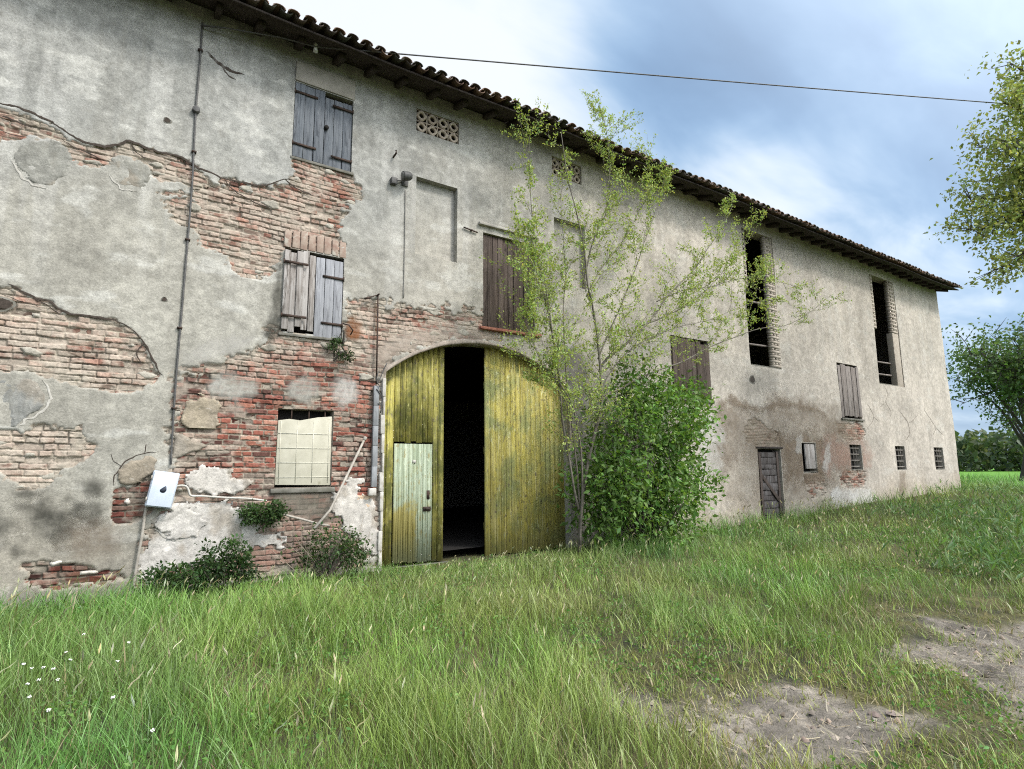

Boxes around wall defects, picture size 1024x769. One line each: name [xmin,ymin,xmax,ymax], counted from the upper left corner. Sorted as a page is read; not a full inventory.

crack [207,51,244,79]
spalling [0,108,362,280]
spalling [0,287,509,590]
damp [697,397,849,483]
damp [830,488,873,505]
spalling [839,469,866,490]
damp [36,503,70,537]